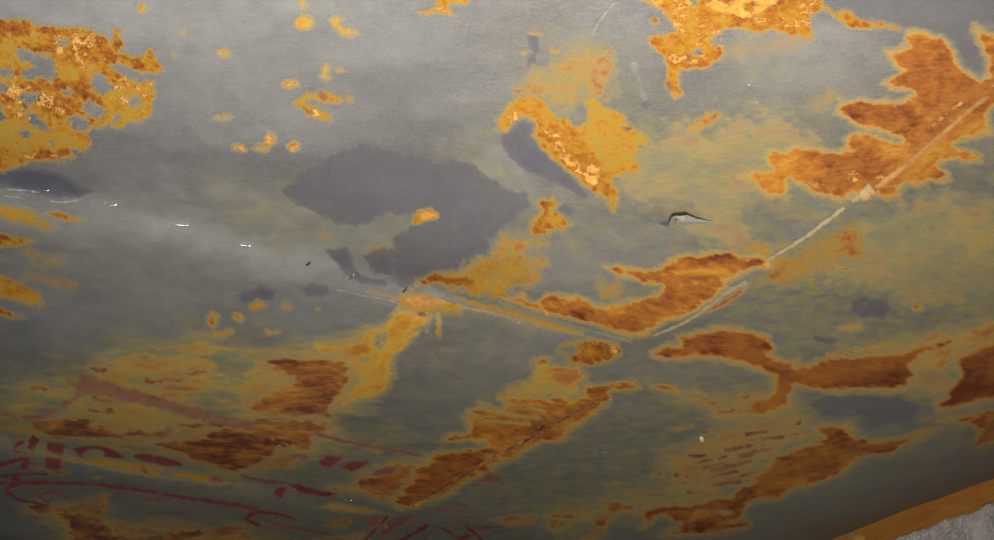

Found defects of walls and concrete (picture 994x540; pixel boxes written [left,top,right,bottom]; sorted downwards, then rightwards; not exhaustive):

corrosion [0,18,165,171]
corrosion [233,133,275,151]
corrosion [295,0,314,29]
corrosion [282,64,353,121]
corrosion [330,16,357,36]
corrosion [416,0,469,16]
corrosion [496,47,651,213]
corrosion [642,0,994,201]
leakage [284,145,529,287]
corrosion [0,196,994,540]